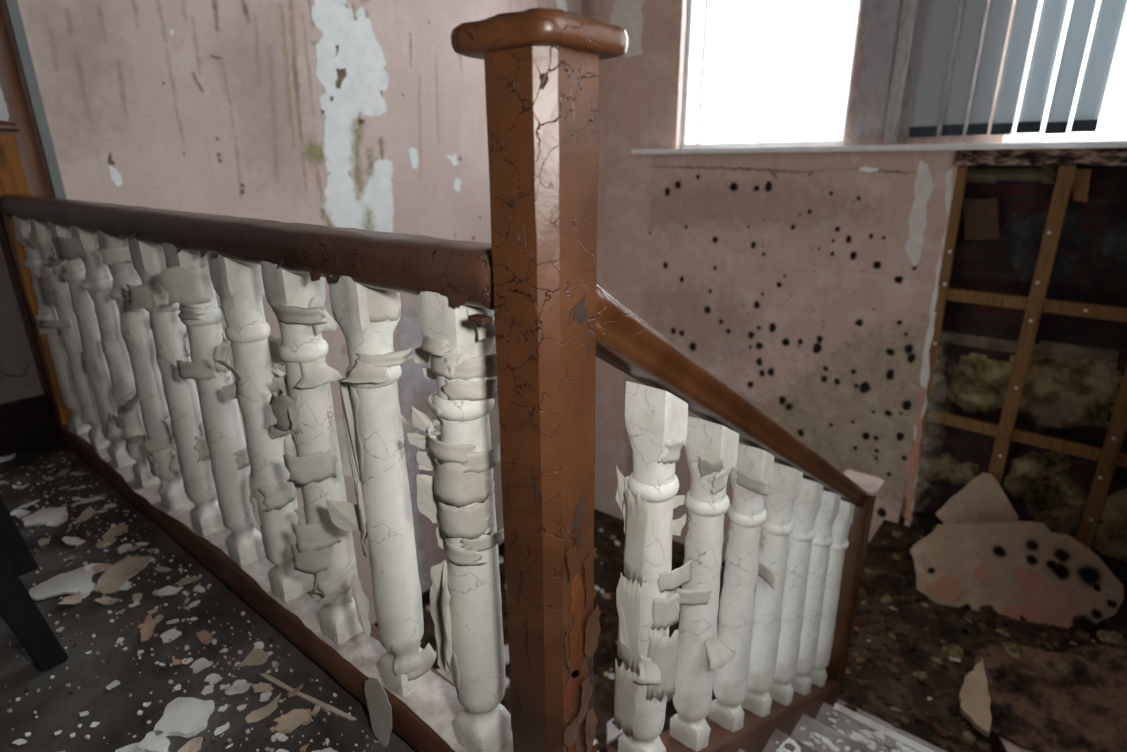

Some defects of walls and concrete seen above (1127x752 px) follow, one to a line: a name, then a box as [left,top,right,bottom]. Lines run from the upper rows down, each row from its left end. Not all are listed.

peeling [0,87,9,121]
peeling [309,0,394,233]
leakage [811,226,857,260]
spalling [904,161,953,527]
leakage [744,311,939,504]
leakage [993,545,1006,557]
leakage [1026,540,1117,632]